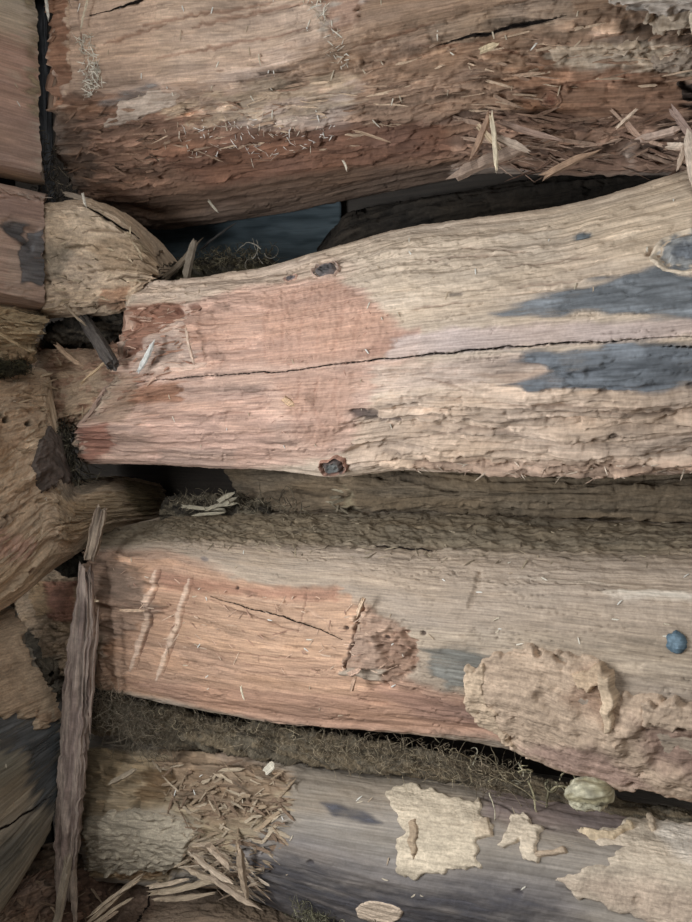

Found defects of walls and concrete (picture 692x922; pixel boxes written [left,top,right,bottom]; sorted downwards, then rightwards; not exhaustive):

crack [90,0,143,16]
leakage [1,222,45,286]
leakage [496,265,692,318]
crack [110,336,692,386]
leakage [509,343,692,392]
crack [213,597,342,640]
peeling [463,663,516,749]
peeling [572,661,620,734]
peeling [640,694,692,733]
crack [0,795,53,830]
peeling [385,782,568,880]
peeling [556,812,692,922]